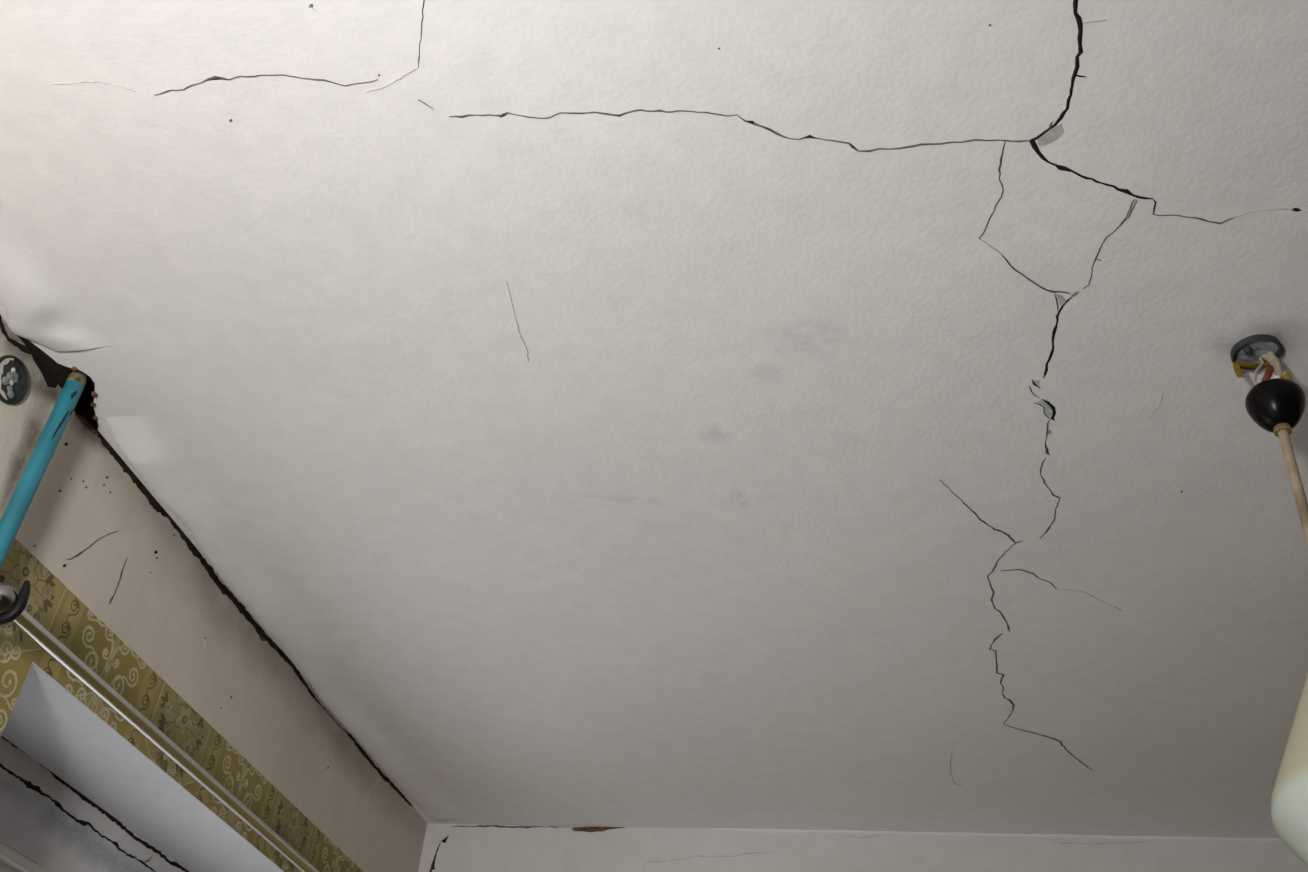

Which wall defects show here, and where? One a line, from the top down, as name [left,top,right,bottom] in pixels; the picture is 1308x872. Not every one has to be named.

crack [53,0,425,96]
crack [418,0,1302,771]
crack [0,315,413,807]
crack [0,736,189,872]
crack [429,825,625,872]